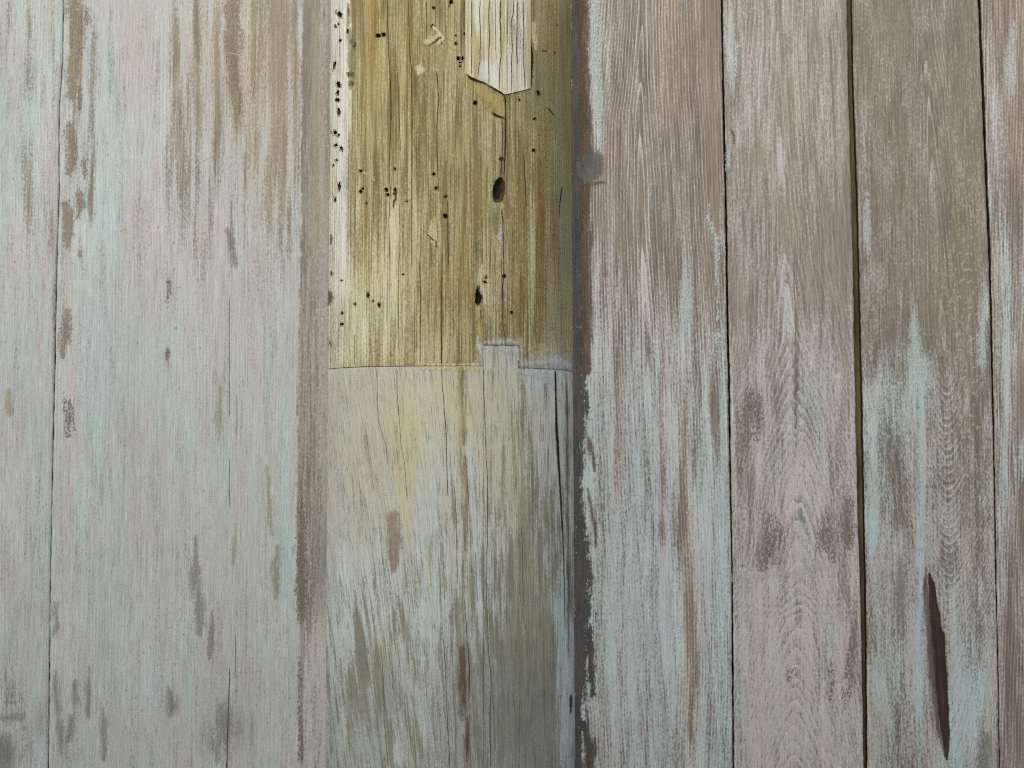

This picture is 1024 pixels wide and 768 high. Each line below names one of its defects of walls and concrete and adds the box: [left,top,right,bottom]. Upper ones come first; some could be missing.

crack [554,371,565,614]